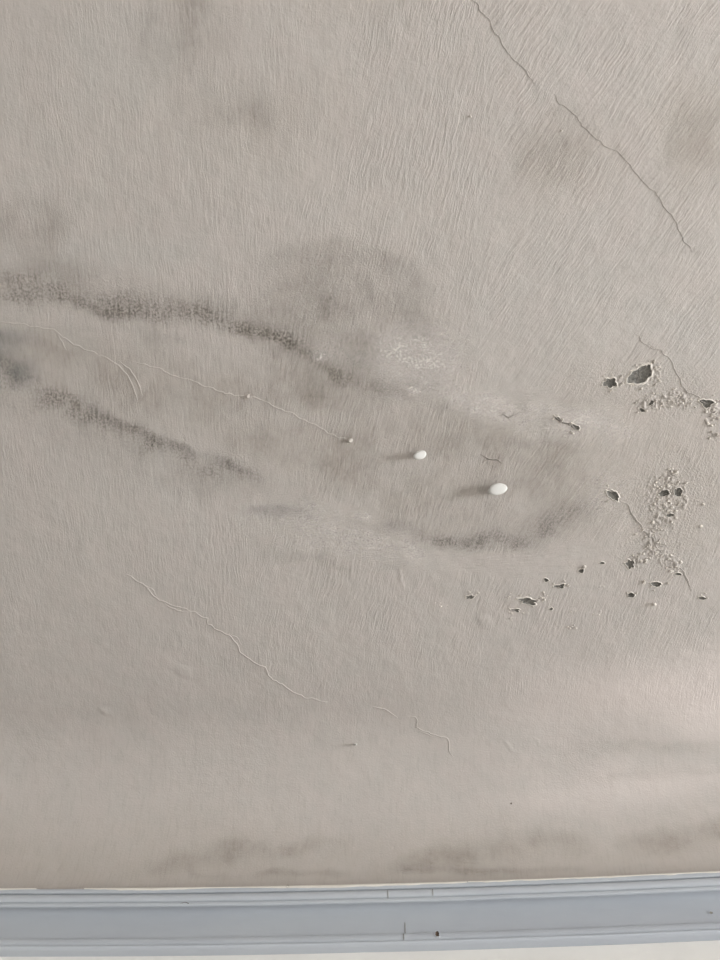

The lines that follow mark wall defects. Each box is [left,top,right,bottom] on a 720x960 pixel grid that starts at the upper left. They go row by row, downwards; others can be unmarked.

crack [472,0,533,81]
crack [554,94,691,248]
crack [0,321,345,439]
peeling [600,360,720,443]
spalling [605,485,624,503]
peeling [624,468,689,599]
crack [127,574,325,702]
spalling [509,594,554,614]